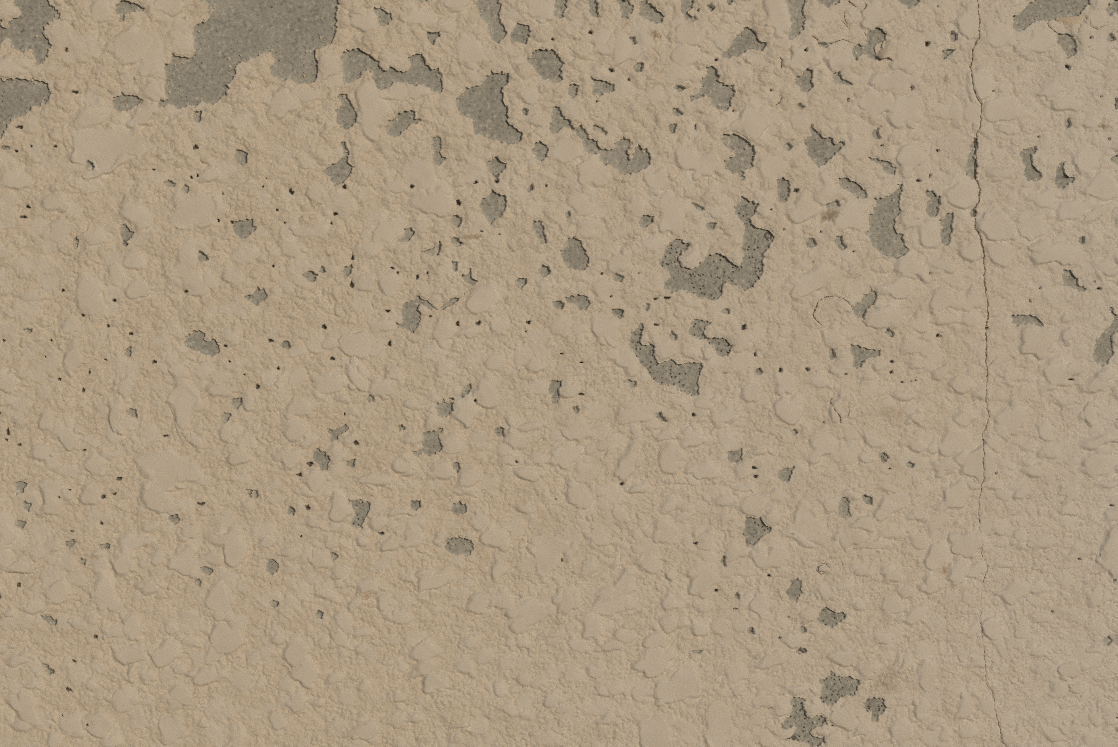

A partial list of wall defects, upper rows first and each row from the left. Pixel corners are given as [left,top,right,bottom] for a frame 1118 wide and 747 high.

peeling [0,0,60,150]
peeling [158,0,339,123]
peeling [323,29,443,186]
peeling [456,70,522,225]
peeling [476,0,614,98]
peeling [532,104,650,175]
peeling [658,195,774,314]
peeling [826,156,908,259]
peeling [629,303,702,396]
peeling [669,318,732,357]
crack [970,0,1007,747]
peeling [781,671,890,747]